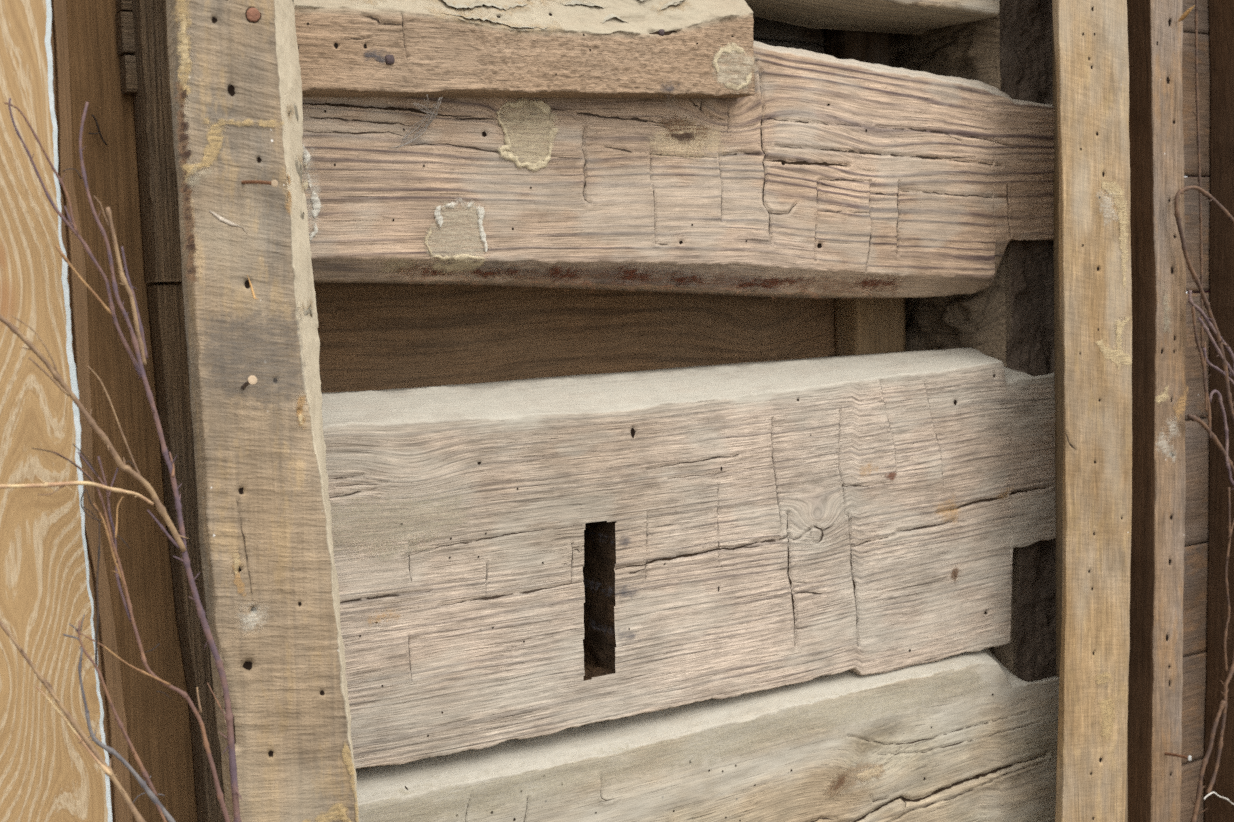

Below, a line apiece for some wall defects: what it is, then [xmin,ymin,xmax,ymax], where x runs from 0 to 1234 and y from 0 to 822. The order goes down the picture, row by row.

crack [649,28,677,36]
crack [539,73,1015,269]
crack [615,388,1048,642]